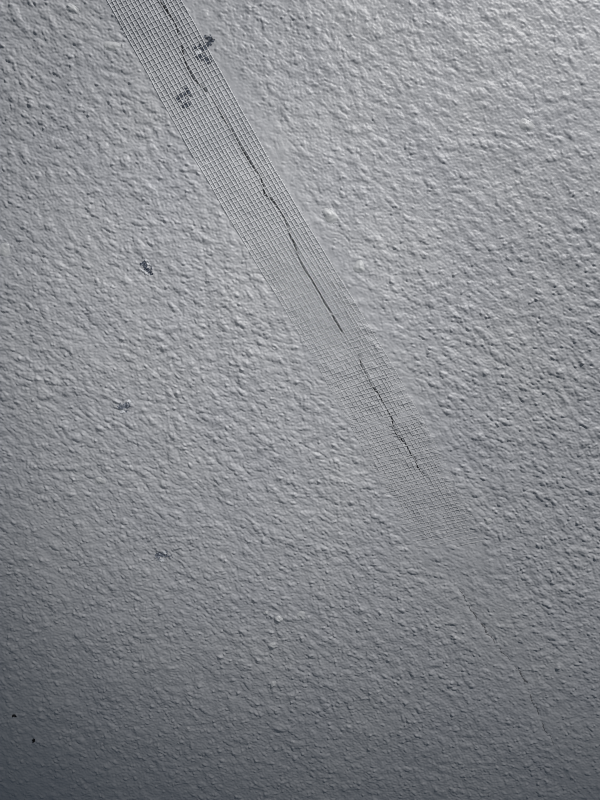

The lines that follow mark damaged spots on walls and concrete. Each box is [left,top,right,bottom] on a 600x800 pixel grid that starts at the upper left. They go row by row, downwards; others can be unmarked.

crack [158,1,342,331]
crack [359,357,420,470]